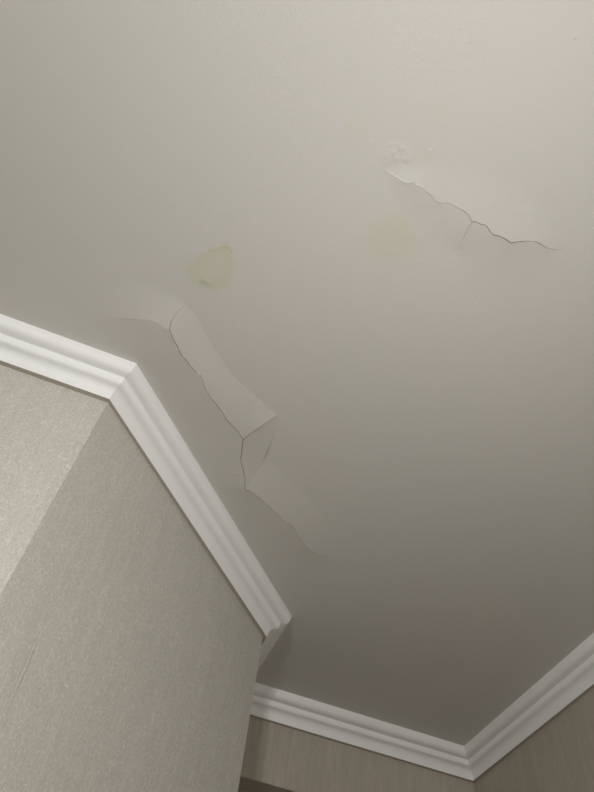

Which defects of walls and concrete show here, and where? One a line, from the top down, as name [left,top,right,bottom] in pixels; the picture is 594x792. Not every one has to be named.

peeling [88,277,339,605]